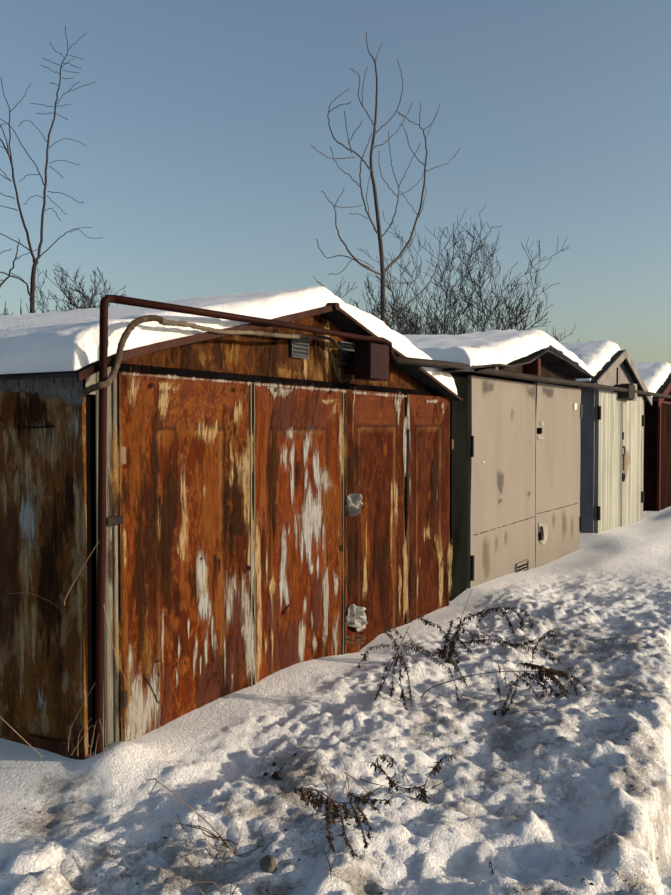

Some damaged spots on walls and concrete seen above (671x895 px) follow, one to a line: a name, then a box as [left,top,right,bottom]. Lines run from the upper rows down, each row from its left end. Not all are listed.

rust [11,386,52,457]
peeling [122,373,139,407]
rust [257,315,339,584]
rust [34,474,74,674]
rust [107,379,245,738]
peeling [156,375,410,688]
rust [286,540,322,631]
peeling [398,541,418,616]
peeling [423,526,453,605]
rust [264,591,299,672]
rust [28,706,85,760]